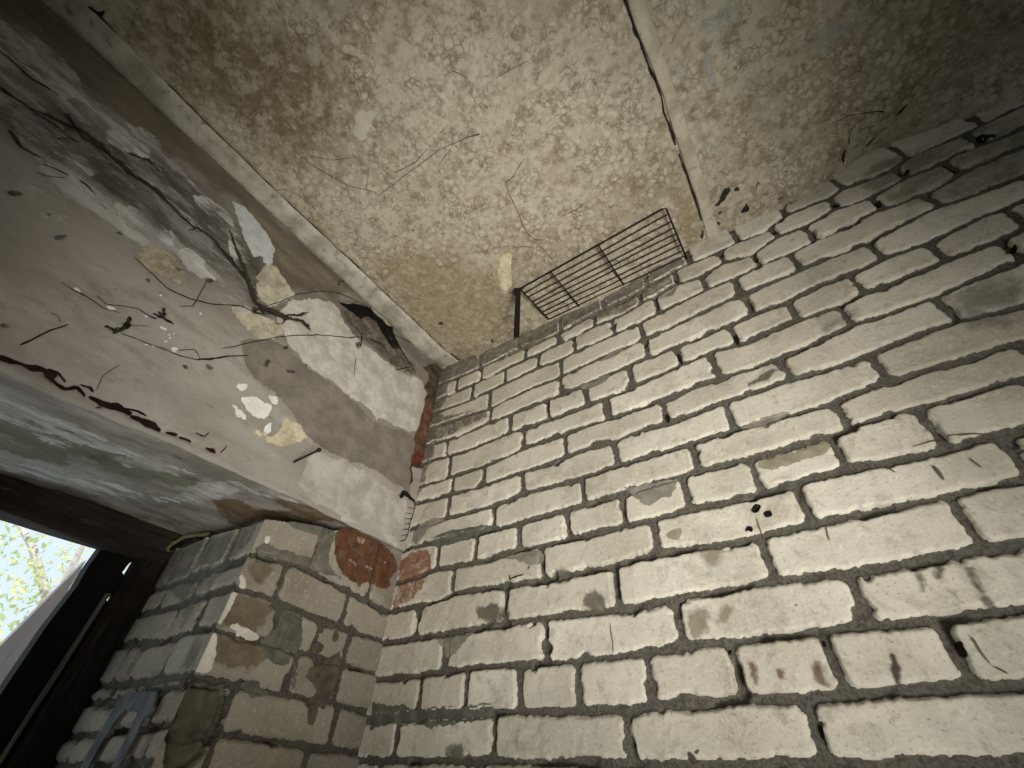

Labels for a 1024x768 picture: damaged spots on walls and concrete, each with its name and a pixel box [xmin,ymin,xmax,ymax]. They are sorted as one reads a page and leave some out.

crack [88,6,119,37]
peeling [0,19,442,494]
crack [0,51,480,375]
crack [624,0,702,221]
damp [0,398,298,504]
rust [211,499,431,609]